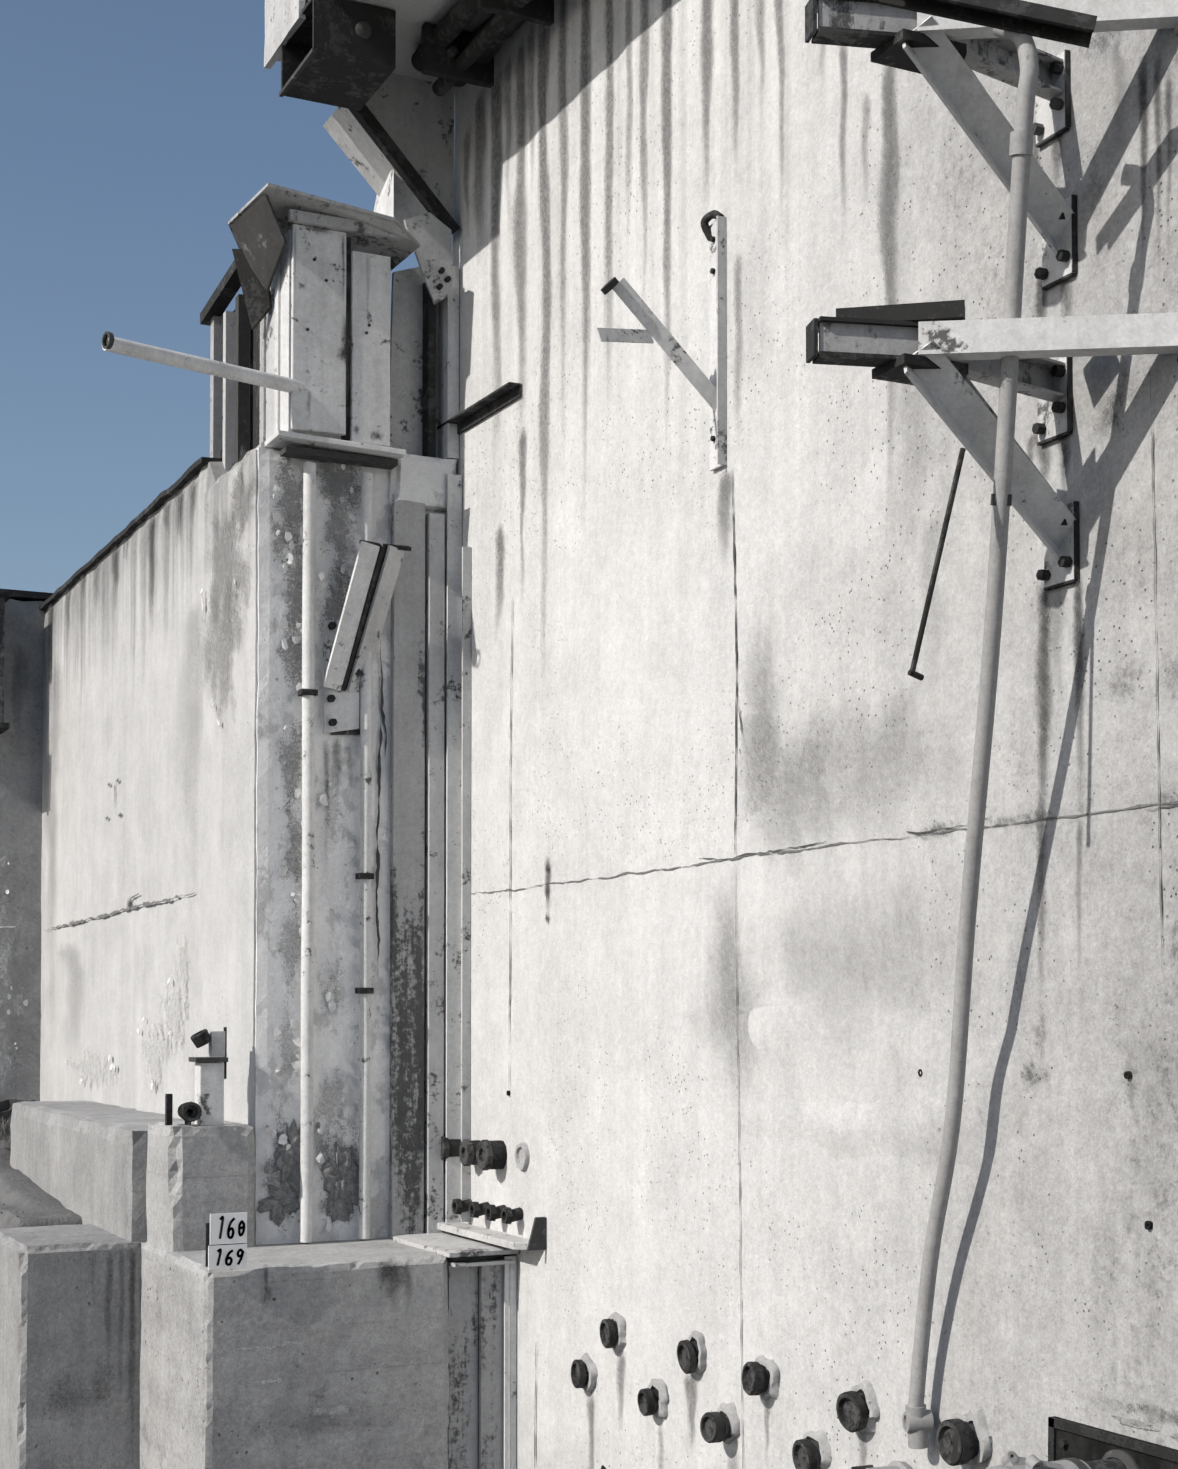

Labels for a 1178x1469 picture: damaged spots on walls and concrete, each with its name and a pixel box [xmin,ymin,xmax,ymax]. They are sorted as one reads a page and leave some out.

water stain [701,0,711,125]
water stain [880,66,897,305]
water stain [464,0,671,512]
water stain [719,474,730,525]
crack [471,379,1178,1016]
crack [0,892,195,930]
crack [733,969,741,1066]
crack [735,1101,743,1208]